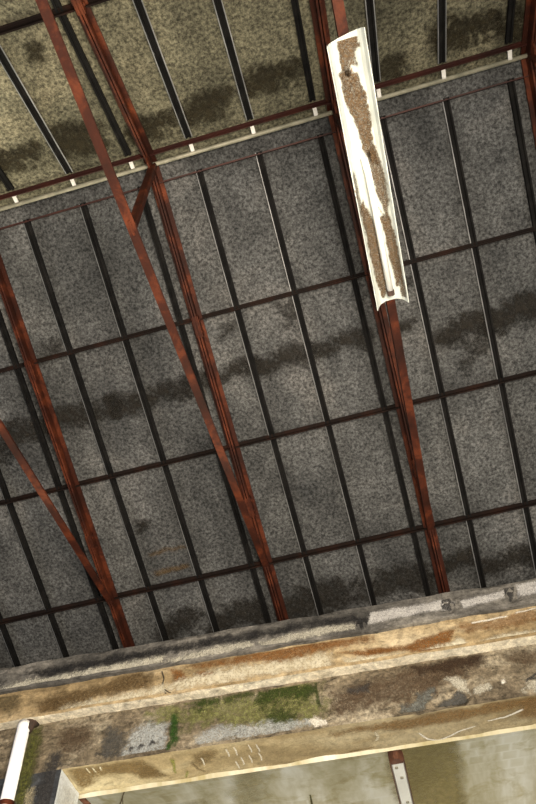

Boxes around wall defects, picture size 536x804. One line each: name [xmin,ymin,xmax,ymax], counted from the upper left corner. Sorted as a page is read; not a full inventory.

leakage [24,42,44,62]
leakage [243,57,303,98]
leakage [428,2,525,55]
leakage [140,86,233,141]
leakage [0,120,96,182]
rust [338,36,406,298]
leakage [219,328,374,383]
leakage [433,291,536,368]
leakage [56,376,194,428]
leakage [332,653,487,715]
leakage [166,714,178,750]
leakage [399,726,475,804]